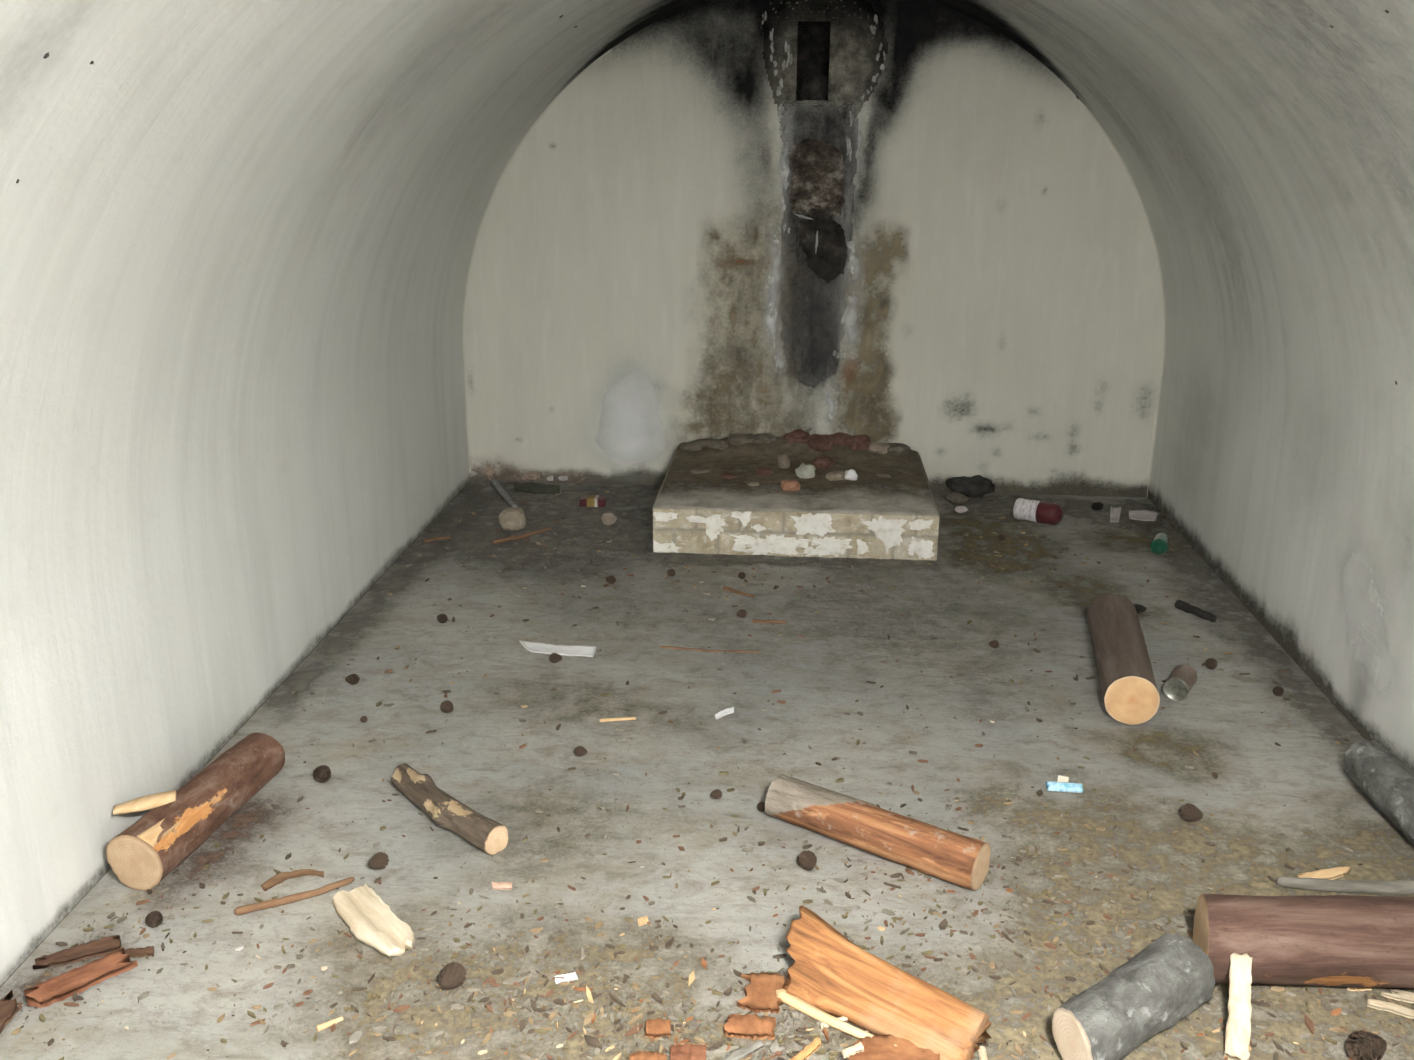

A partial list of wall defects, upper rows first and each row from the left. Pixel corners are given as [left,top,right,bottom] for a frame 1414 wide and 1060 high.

flaking render [762,0,886,423]
leakage [688,213,809,438]
leakage [837,230,907,443]
peeling [653,511,934,559]